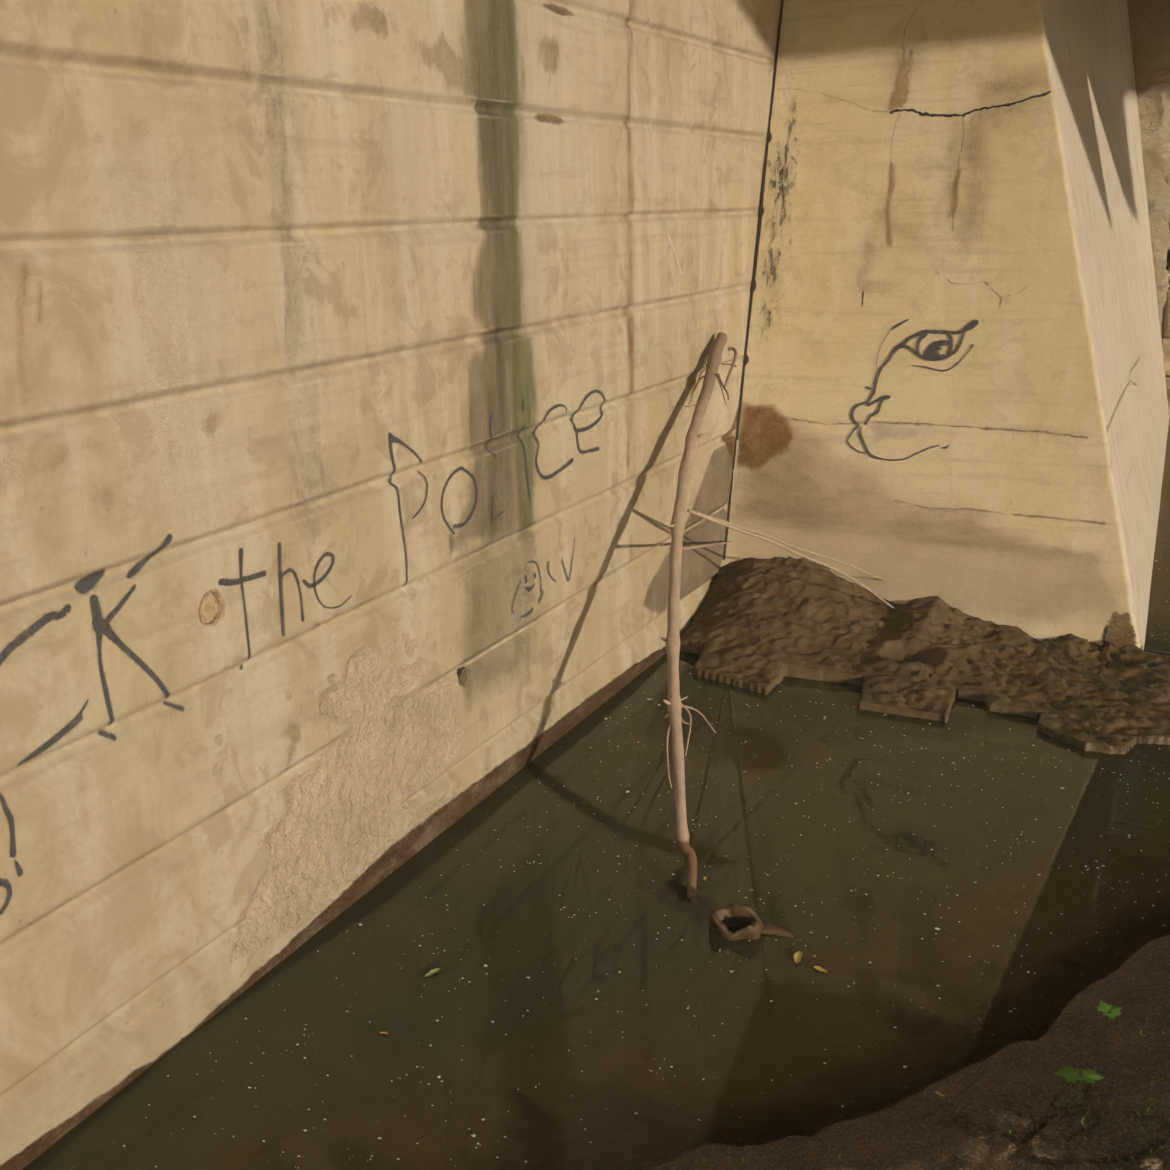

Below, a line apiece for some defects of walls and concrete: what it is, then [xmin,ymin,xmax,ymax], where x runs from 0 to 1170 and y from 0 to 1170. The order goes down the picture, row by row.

leakage [453,0,558,718]
mould [756,78,808,350]
crack [781,70,1051,231]
spalling [229,621,464,964]